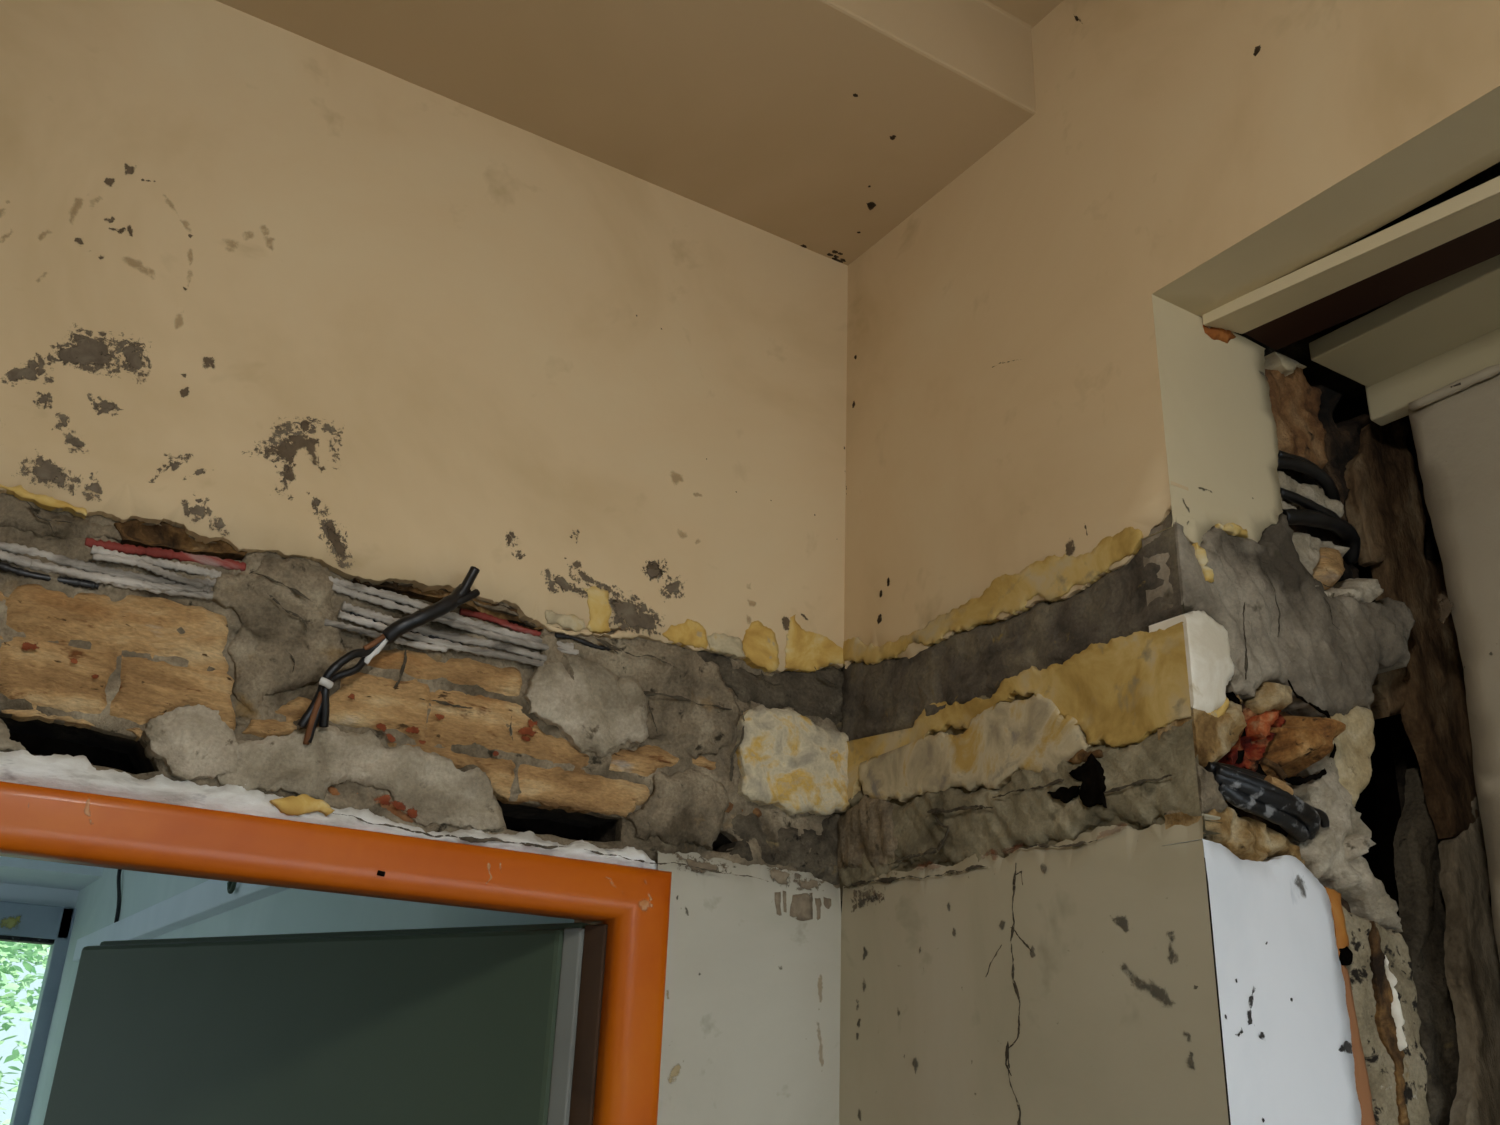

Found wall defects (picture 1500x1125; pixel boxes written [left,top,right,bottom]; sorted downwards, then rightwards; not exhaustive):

flaking render [1264,352,1371,590]
flaking render [0,325,1305,921]
crack [1103,774,1172,793]
spalling [1322,667,1407,807]
crack [844,779,1097,1125]
peeling [1113,916,1128,932]
spalling [1324,887,1410,1125]